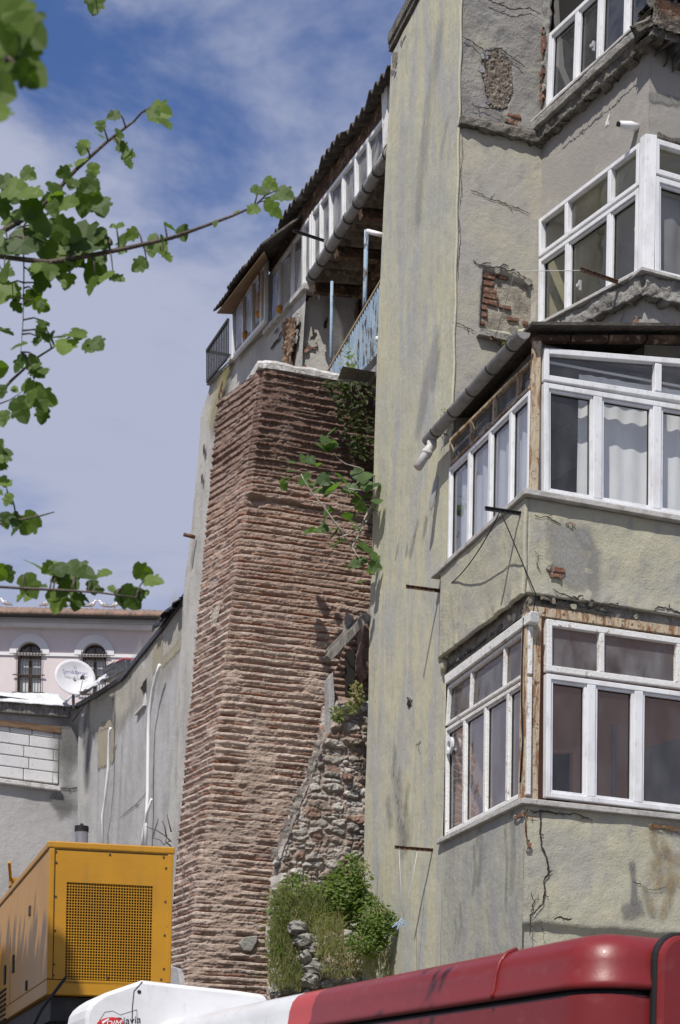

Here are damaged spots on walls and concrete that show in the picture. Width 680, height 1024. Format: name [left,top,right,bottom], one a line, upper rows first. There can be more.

crack [488,0,541,15]
flaking render [477,47,522,127]
crack [457,144,534,290]
flaking render [281,311,318,367]
flaking render [354,299,362,320]
flaking render [476,268,533,344]
flaking render [546,564,566,579]
crack [525,809,591,935]